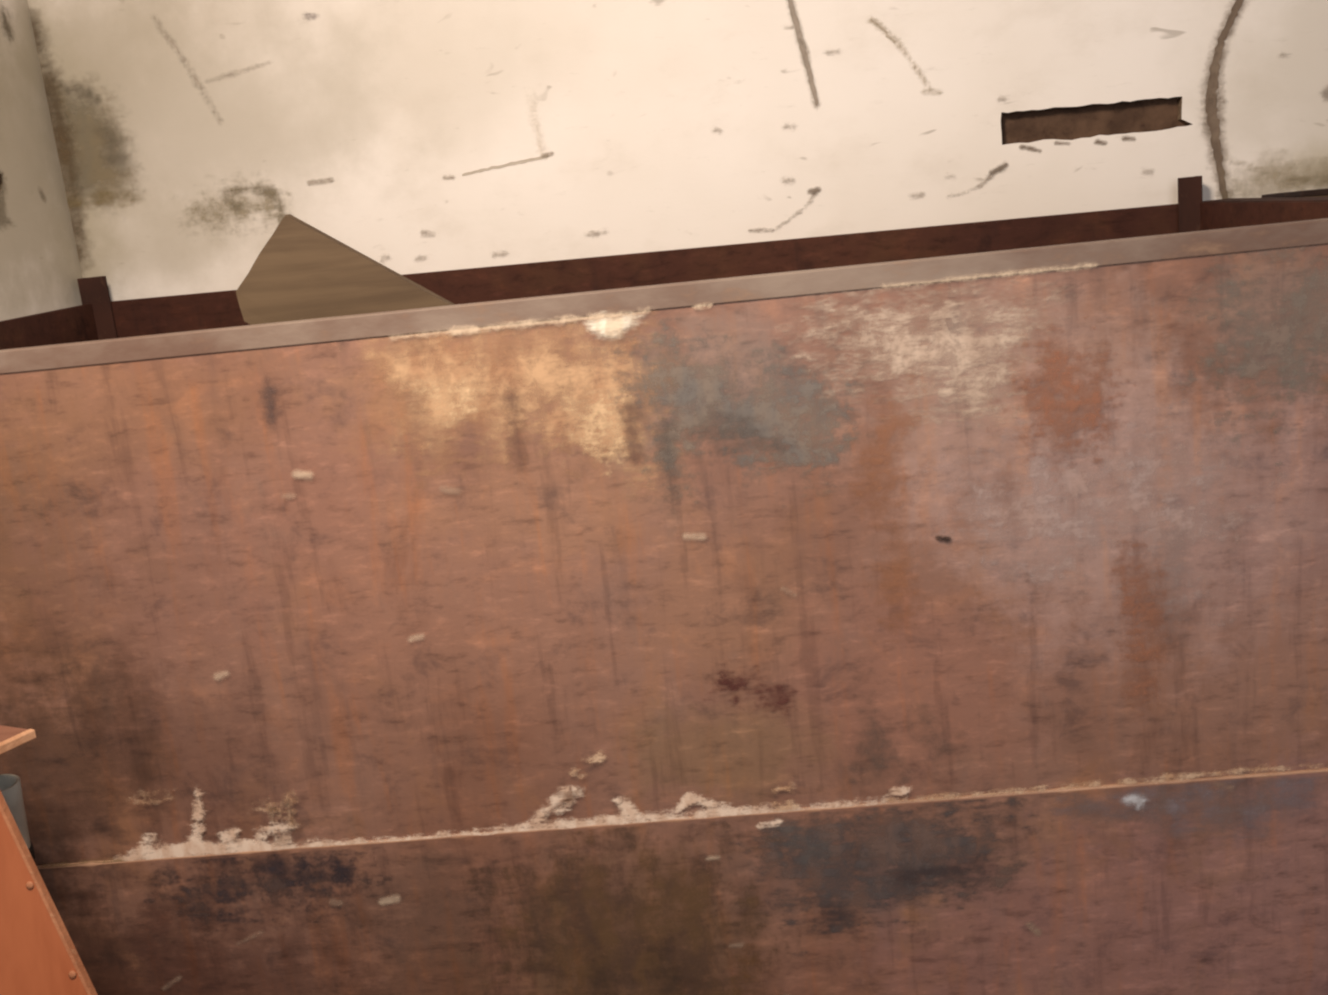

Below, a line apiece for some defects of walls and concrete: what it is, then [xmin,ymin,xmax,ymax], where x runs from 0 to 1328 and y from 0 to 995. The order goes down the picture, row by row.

crack [788,0,818,106]
crack [870,19,916,68]
water stain [31,19,130,261]
crack [445,153,553,179]
water stain [195,187,283,221]